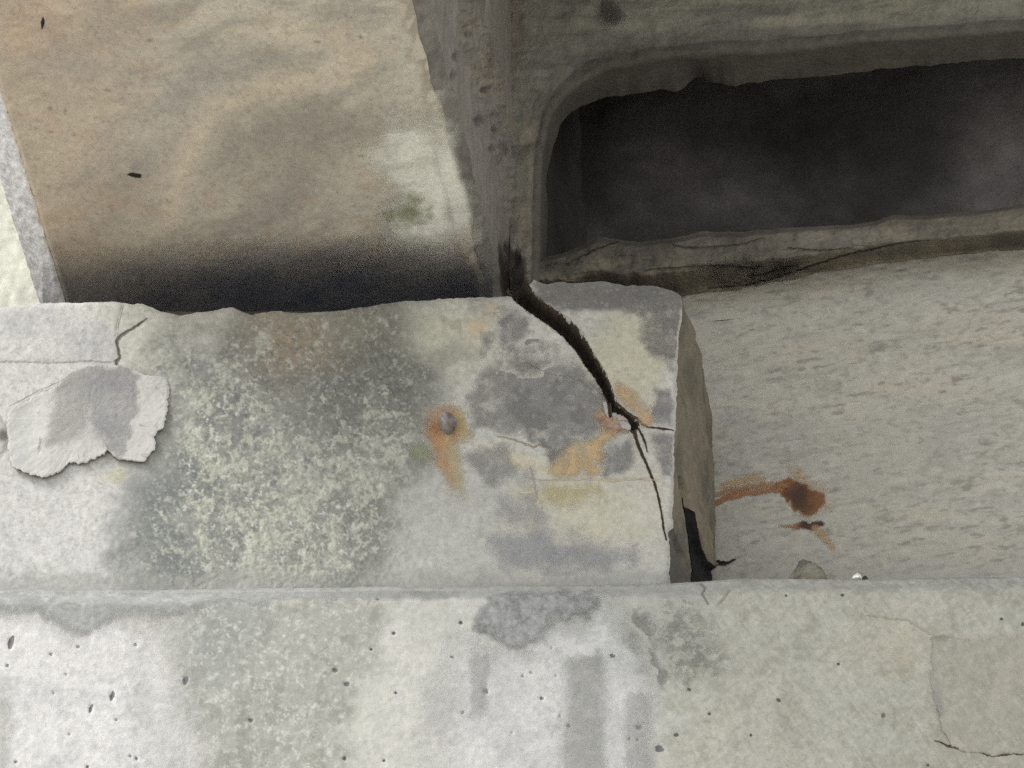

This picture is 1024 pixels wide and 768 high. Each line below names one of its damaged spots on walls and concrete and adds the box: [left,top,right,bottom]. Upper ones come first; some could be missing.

damp [486,314,538,345]
peeling [0,365,169,478]
rust [430,410,469,479]
damp [471,448,516,485]
damp [473,366,606,461]
crack [497,278,674,541]
rust [550,409,629,476]
damp [604,443,631,476]
damp [653,391,672,421]
rust [715,475,834,549]
damp [437,589,666,768]
crack [934,740,1023,757]